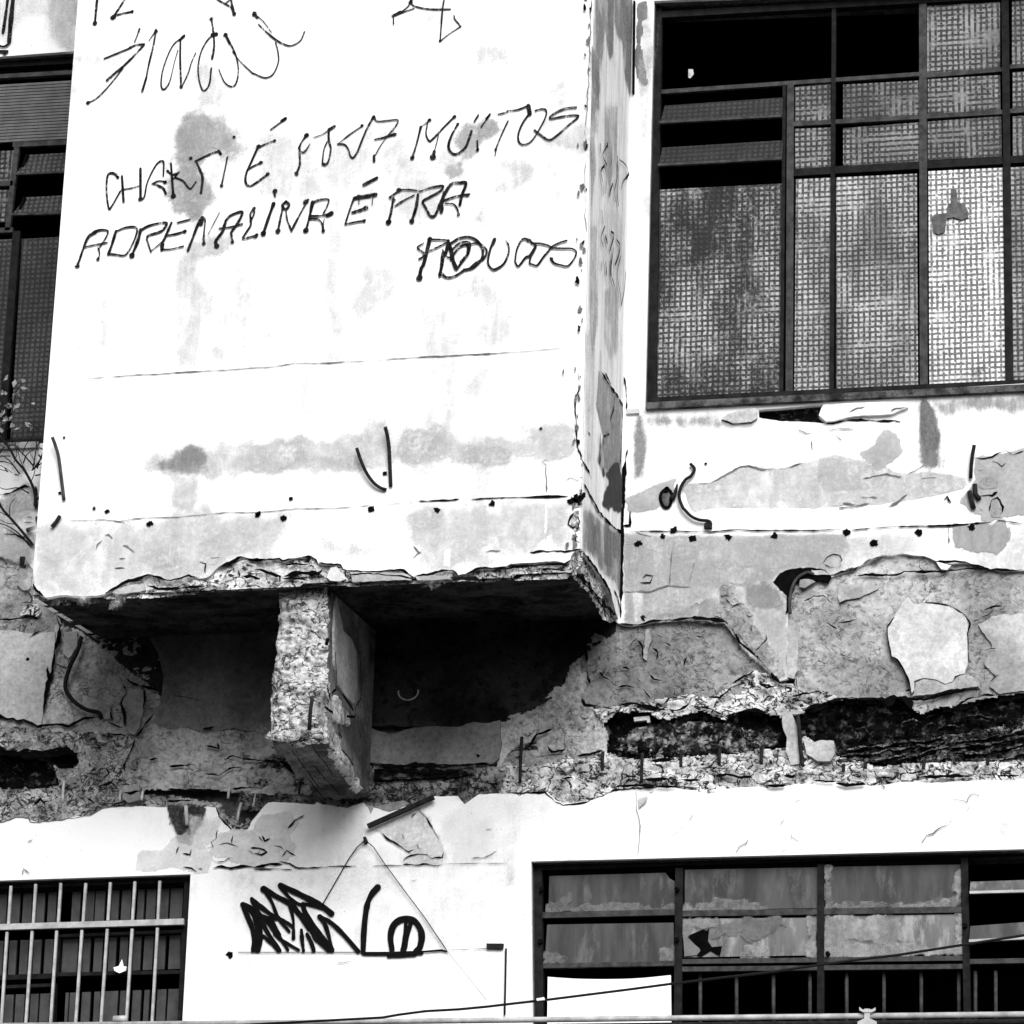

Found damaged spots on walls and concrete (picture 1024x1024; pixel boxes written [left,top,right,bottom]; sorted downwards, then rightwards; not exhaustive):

leakage [165,114,240,220]
leakage [33,421,575,599]
leakage [919,395,1024,467]
spalling [0,355,1024,868]